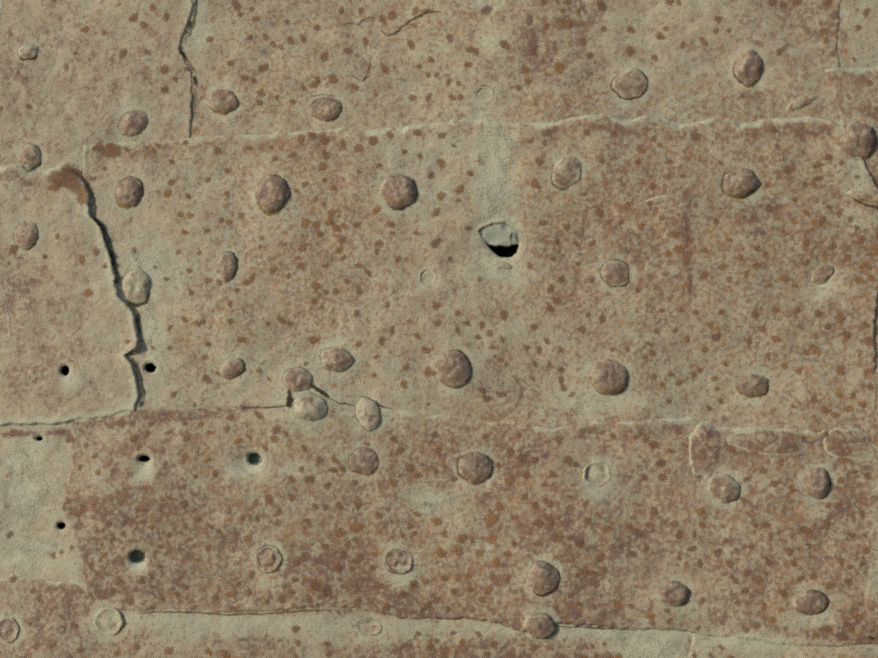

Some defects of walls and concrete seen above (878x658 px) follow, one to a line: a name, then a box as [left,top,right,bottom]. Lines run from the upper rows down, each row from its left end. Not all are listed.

crack [179,0,196,122]
corrosion [227,60,337,105]
corrosion [47,141,129,205]
corrosion [269,131,393,191]
crack [87,182,120,283]
corrosion [301,196,371,277]
crack [127,303,144,407]
corrosion [523,324,575,398]
corrosion [303,502,383,588]
corrosion [390,501,517,616]
crack [140,609,330,617]
crack [557,624,635,632]